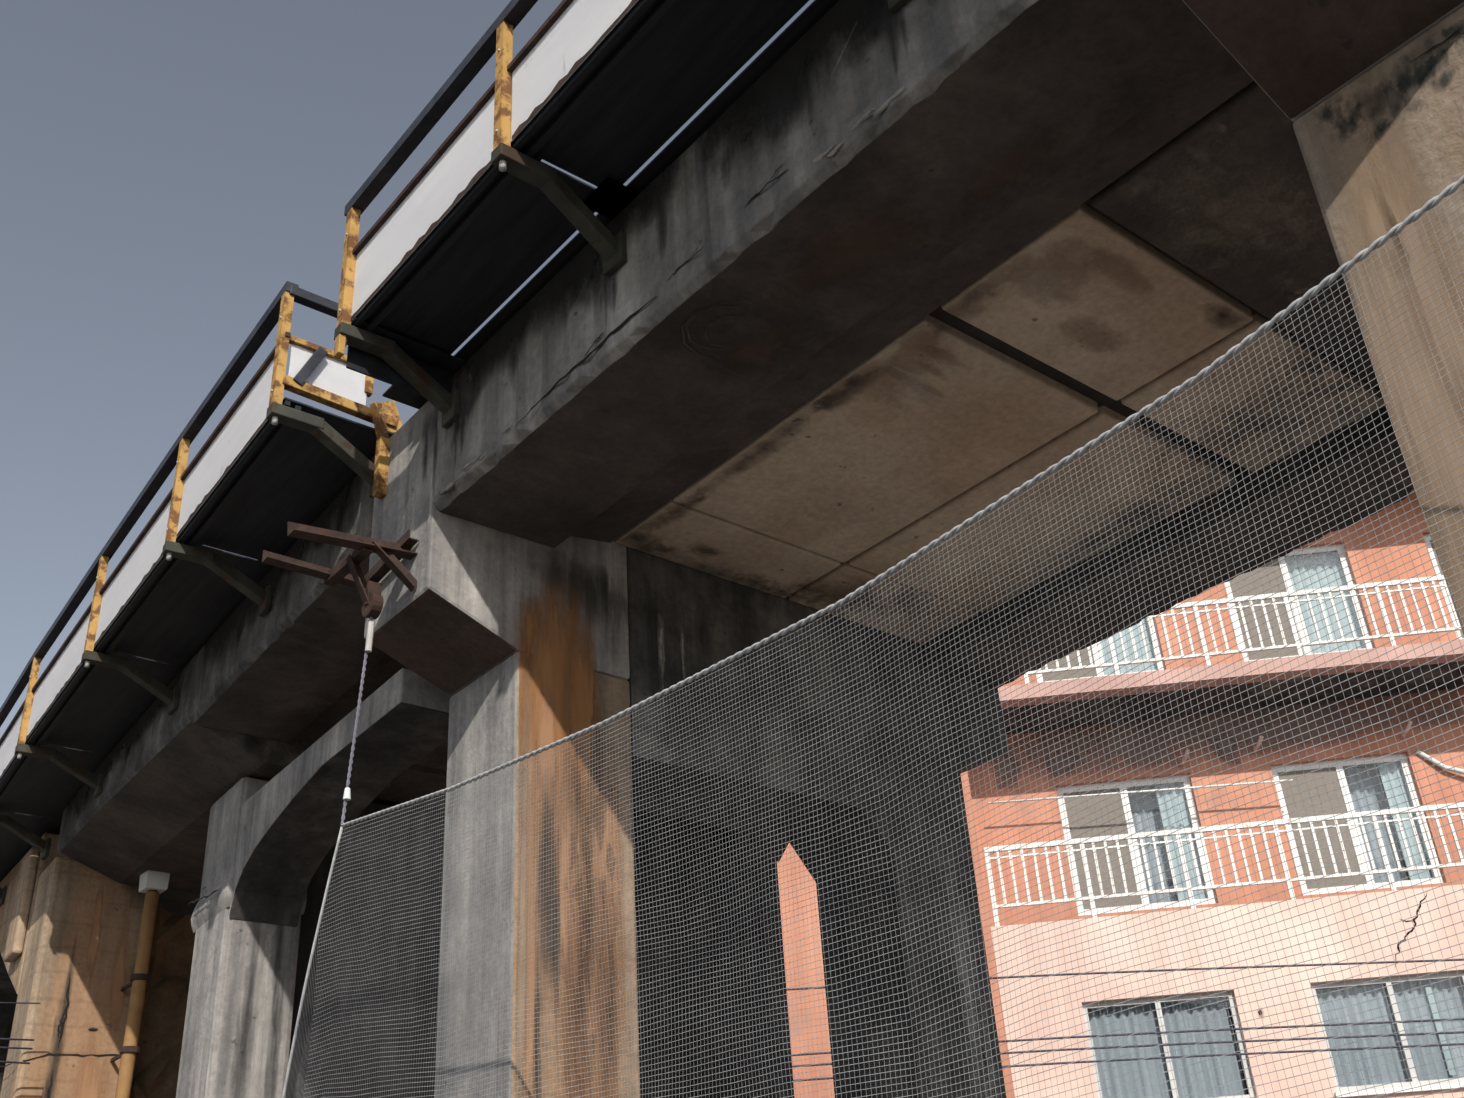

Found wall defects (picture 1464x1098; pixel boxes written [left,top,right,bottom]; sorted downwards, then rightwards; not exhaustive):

leakage [1321,23,1464,133]
crack [1411,29,1464,62]
rust [519,587,623,1098]
crack [1395,891,1428,966]
crack [0,974,119,1098]